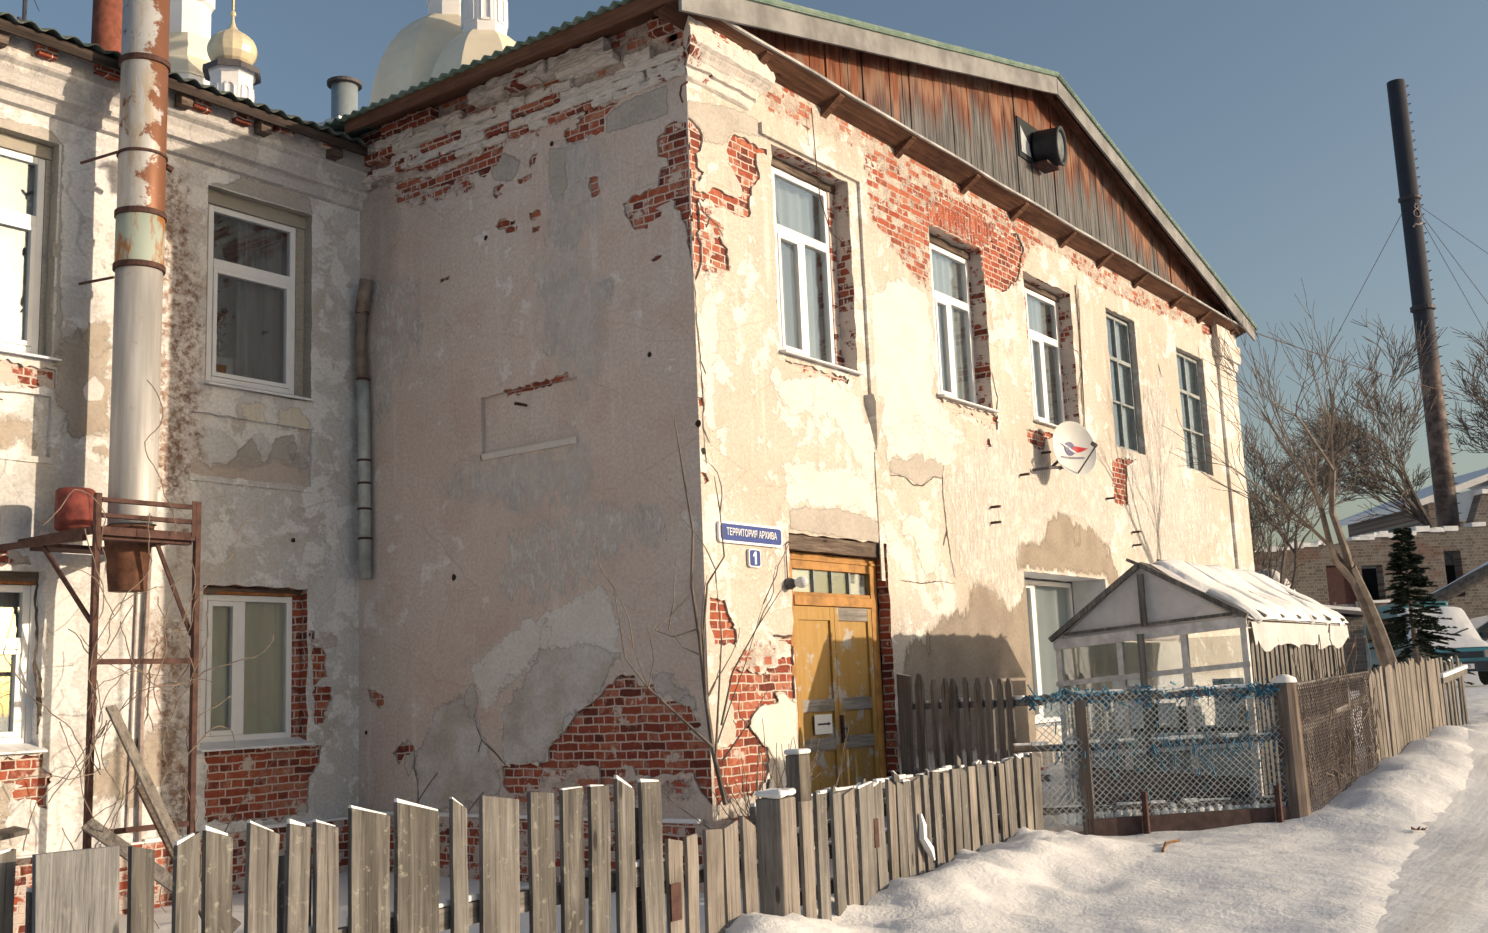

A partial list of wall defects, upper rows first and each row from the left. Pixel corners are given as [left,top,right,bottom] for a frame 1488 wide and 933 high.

flaking render [371,22,684,205]
flaking render [0,321,112,458]
corrosion [158,173,203,502]
flaking render [190,429,309,487]
flaking render [484,210,541,241]
flaking render [620,119,765,457]
flaking render [765,87,1218,758]
flaking render [0,754,55,829]
corrosion [152,620,189,821]
flaking render [203,745,323,824]
flaking render [309,631,336,726]
flaking render [395,584,797,812]